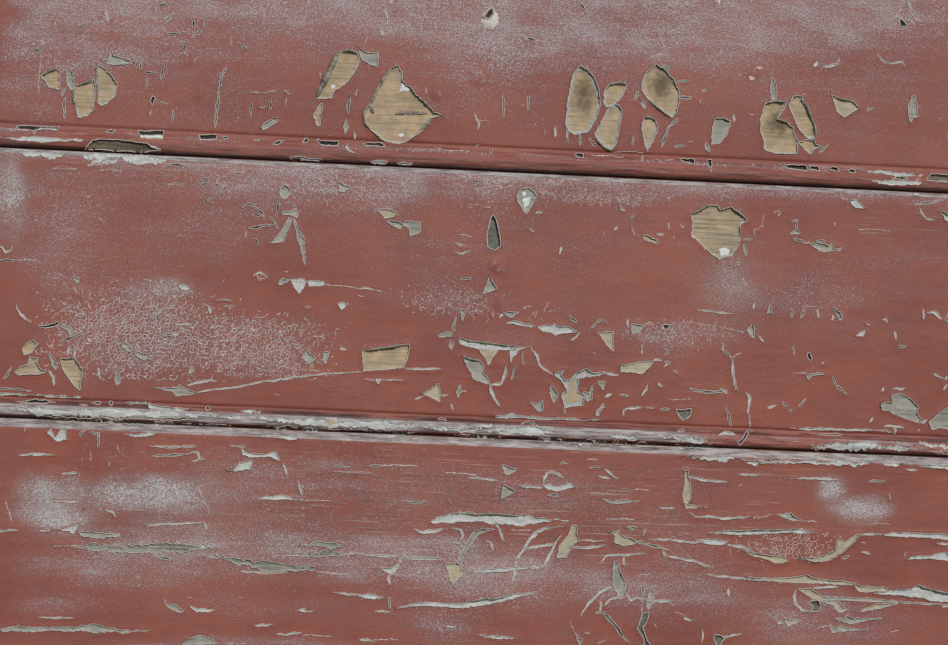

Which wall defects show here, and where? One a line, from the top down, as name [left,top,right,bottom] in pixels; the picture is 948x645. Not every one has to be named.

peeling [40,49,135,119]
peeling [312,46,444,145]
peeling [564,64,628,151]
peeling [639,63,681,153]
peeling [759,76,823,156]
peeling [241,184,307,266]
peeling [690,203,749,267]
peeling [277,277,383,295]
peeling [537,322,578,337]
peeling [740,322,756,339]
peeling [0,330,948,510]
peeling [36,510,948,645]